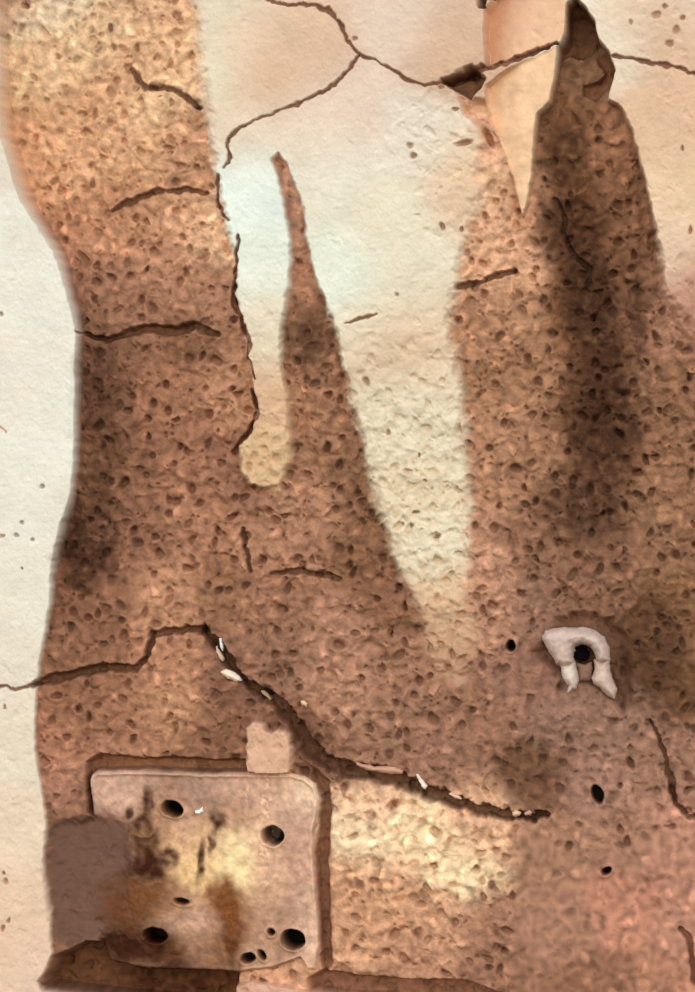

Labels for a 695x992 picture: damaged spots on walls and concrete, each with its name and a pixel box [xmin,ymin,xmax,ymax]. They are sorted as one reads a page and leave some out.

spalling [557,0,612,62]
crack [611,53,695,76]
crack [74,0,562,455]
flaking render [212,143,293,492]
flaking render [339,337,480,686]
crack [0,624,551,824]
crack [649,719,695,821]
corrosion [126,791,178,878]
corrosion [110,927,210,991]
corrosion [198,814,223,874]
corrosion [216,879,241,951]
spalling [38,766,517,992]